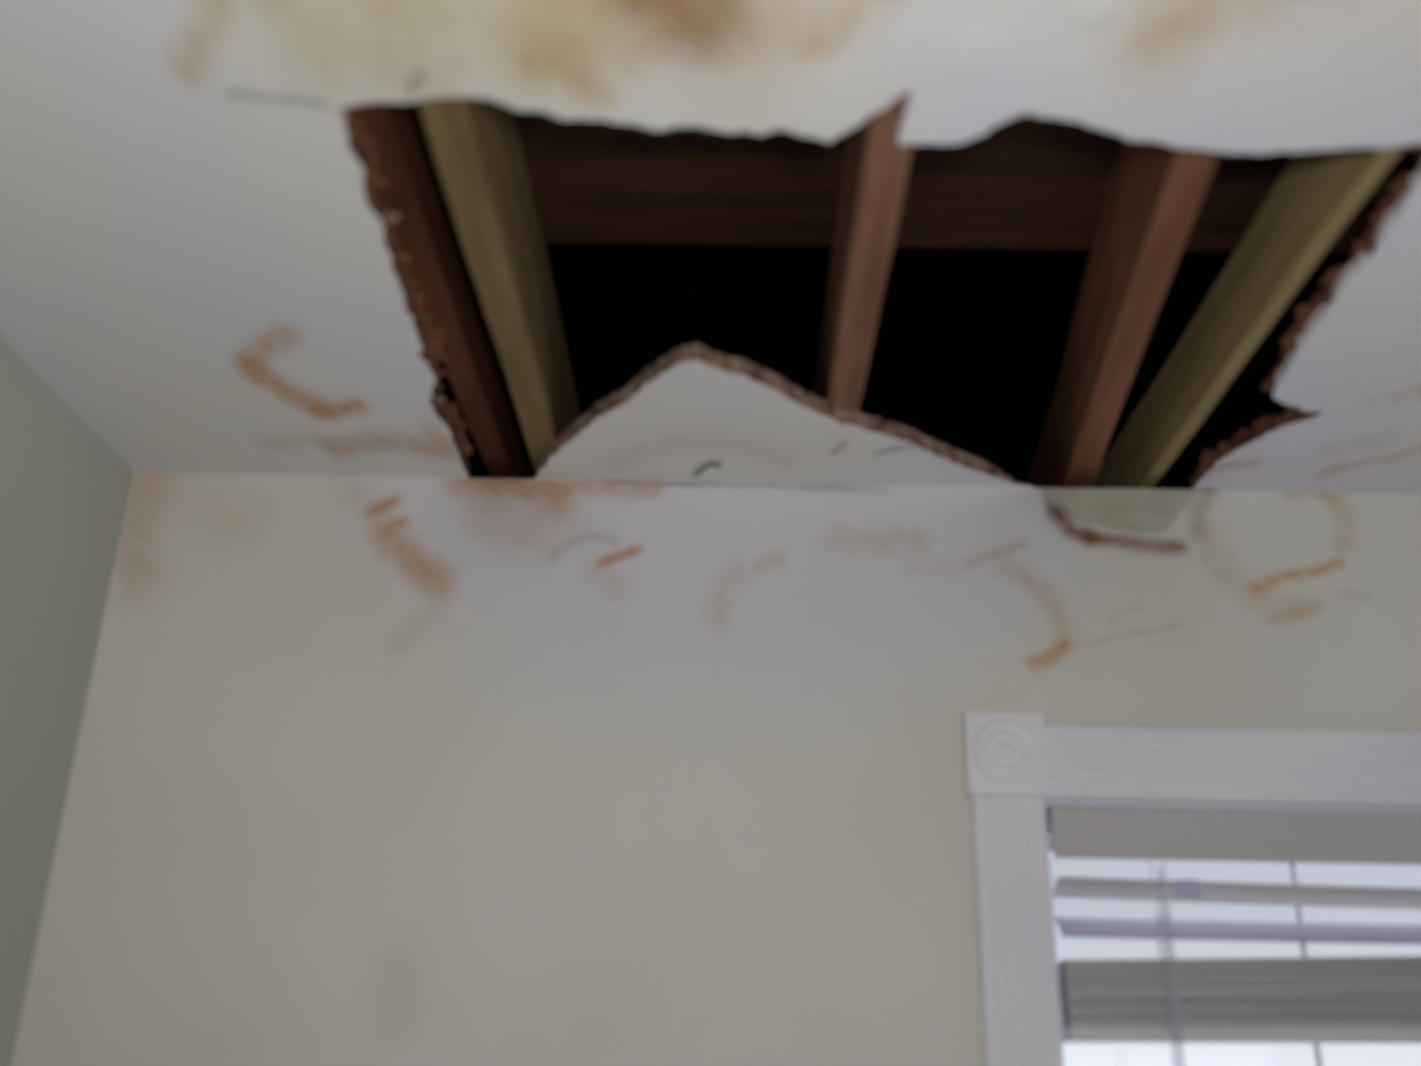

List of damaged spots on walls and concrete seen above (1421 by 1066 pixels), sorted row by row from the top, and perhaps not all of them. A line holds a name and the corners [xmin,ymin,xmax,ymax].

spalling [429,353,490,478]
spalling [544,242,832,417]
spalling [859,247,1091,484]
spalling [1052,241,1376,550]